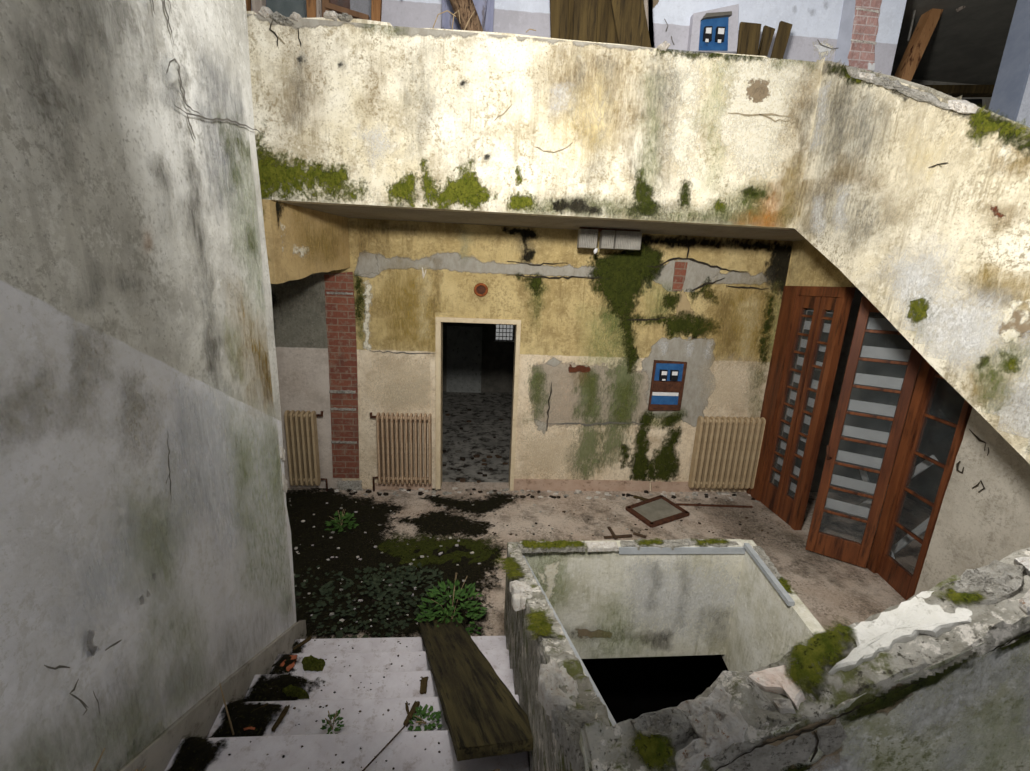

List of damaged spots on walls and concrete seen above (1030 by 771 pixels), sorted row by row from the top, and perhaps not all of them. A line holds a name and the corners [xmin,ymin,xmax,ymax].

crack [152,0,174,43]
crack [174,91,260,139]
spalling [994,119,1030,156]
flaking render [672,261,688,291]
flaking render [324,272,362,490]
flaking render [529,358,649,434]
leakage [572,565,738,651]
spalling [504,539,1030,771]
crack [44,665,100,715]